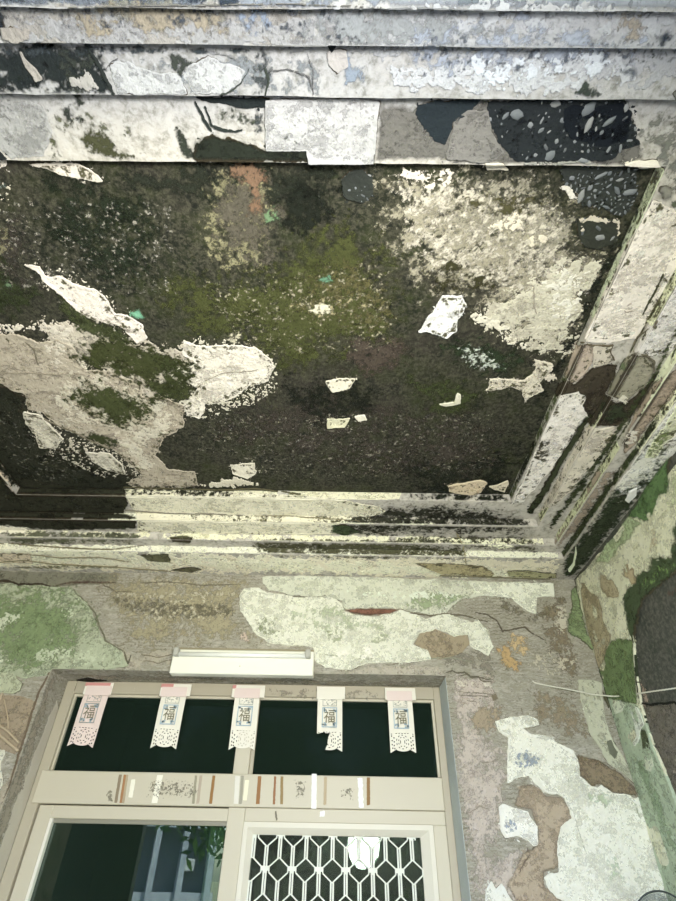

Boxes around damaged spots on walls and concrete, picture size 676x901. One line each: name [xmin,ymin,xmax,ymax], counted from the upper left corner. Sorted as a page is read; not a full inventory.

spalling [196,96,269,109]
crack [195,53,320,137]
mould [0,136,347,290]
mould [433,256,508,295]
spalling [377,99,664,319]
damp [0,387,232,545]
damp [194,335,550,576]
damp [534,340,657,426]
peeling [555,344,676,549]
peeling [0,553,569,670]
crack [401,609,545,640]
peeling [450,673,676,901]